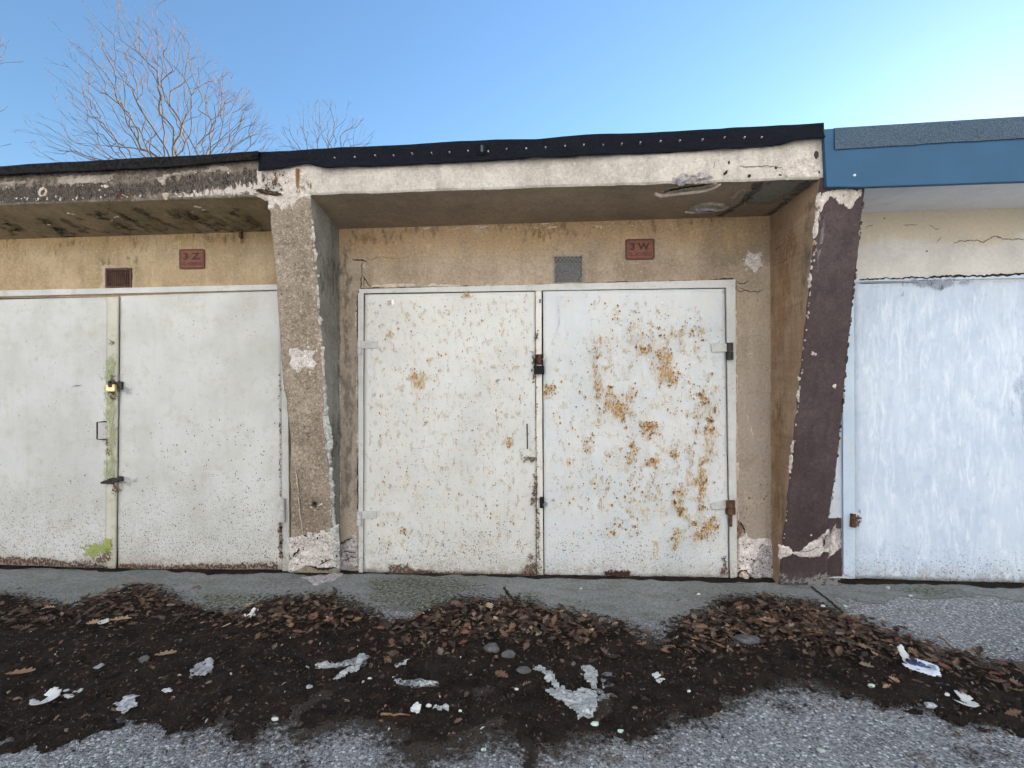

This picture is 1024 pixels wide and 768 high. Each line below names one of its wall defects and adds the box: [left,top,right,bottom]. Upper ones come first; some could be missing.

leakage [43,184,266,280]
leakage [173,167,262,197]
spalling [654,171,729,214]
crack [860,218,1024,280]
peeling [795,189,864,426]
flaking render [288,220,359,585]
rust [371,302,720,577]
spalling [788,440,796,479]
spalling [832,269,857,458]
rust [0,522,284,570]
flaking render [737,478,841,579]